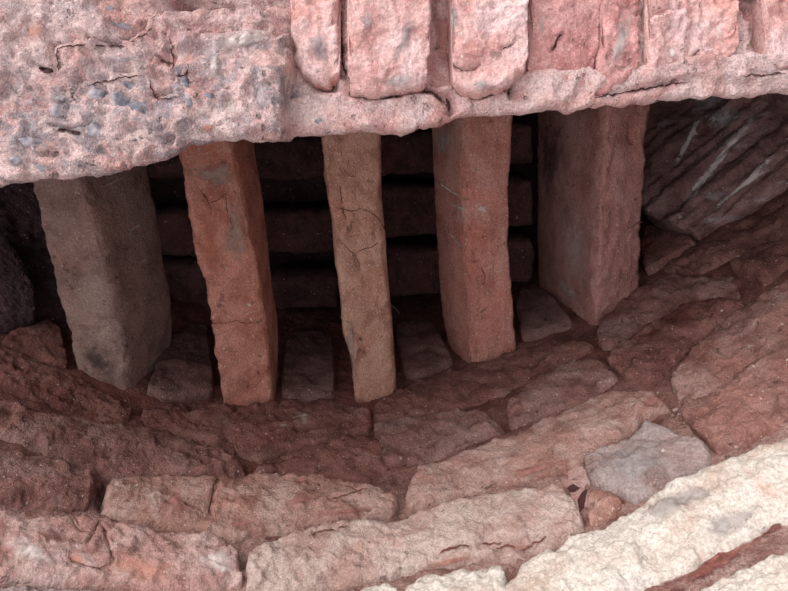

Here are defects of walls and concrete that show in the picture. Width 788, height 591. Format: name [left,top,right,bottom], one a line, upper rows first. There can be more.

crack [56,28,152,72]
crack [87,40,189,100]
crack [594,49,700,98]
crack [339,160,383,271]
crack [438,536,546,555]